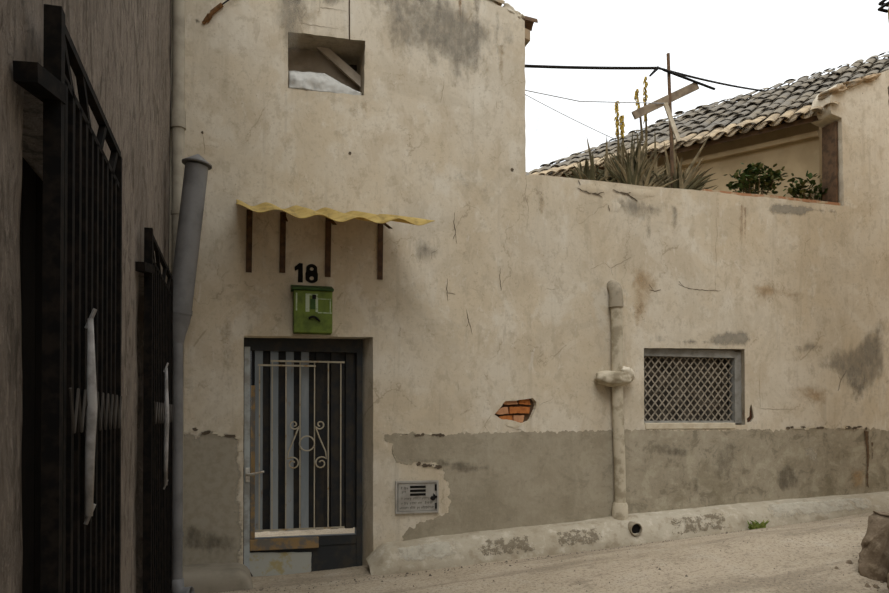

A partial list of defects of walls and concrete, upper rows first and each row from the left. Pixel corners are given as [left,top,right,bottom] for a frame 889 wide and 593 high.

leakage [416,0,483,61]
crack [578,180,637,211]
flaking render [495,398,539,428]
spalling [481,535,533,556]
spalling [557,528,602,546]
spalling [671,513,725,535]